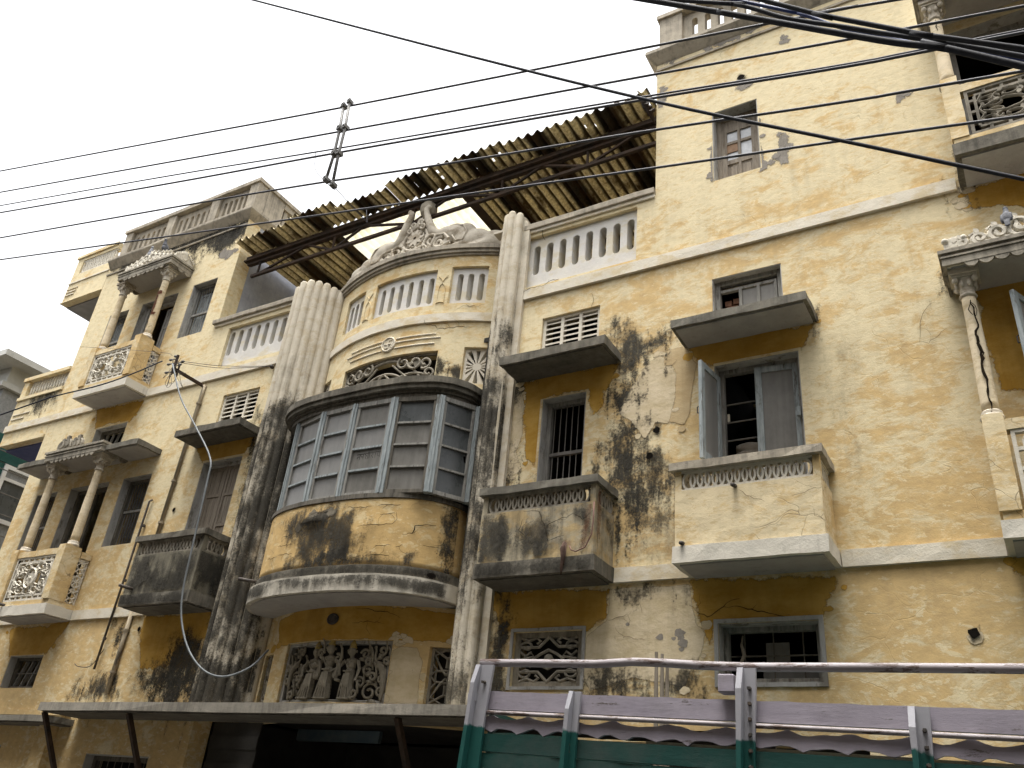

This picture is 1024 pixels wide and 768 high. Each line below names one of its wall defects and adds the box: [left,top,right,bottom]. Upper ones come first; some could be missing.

spalling [759,118,793,172]
peeling [950,186,975,212]
leakage [169,220,248,268]
peeling [619,346,696,439]
leakage [592,315,675,556]
leakage [67,322,591,705]
crack [272,504,445,568]
crack [518,511,592,541]
peeling [584,584,712,695]